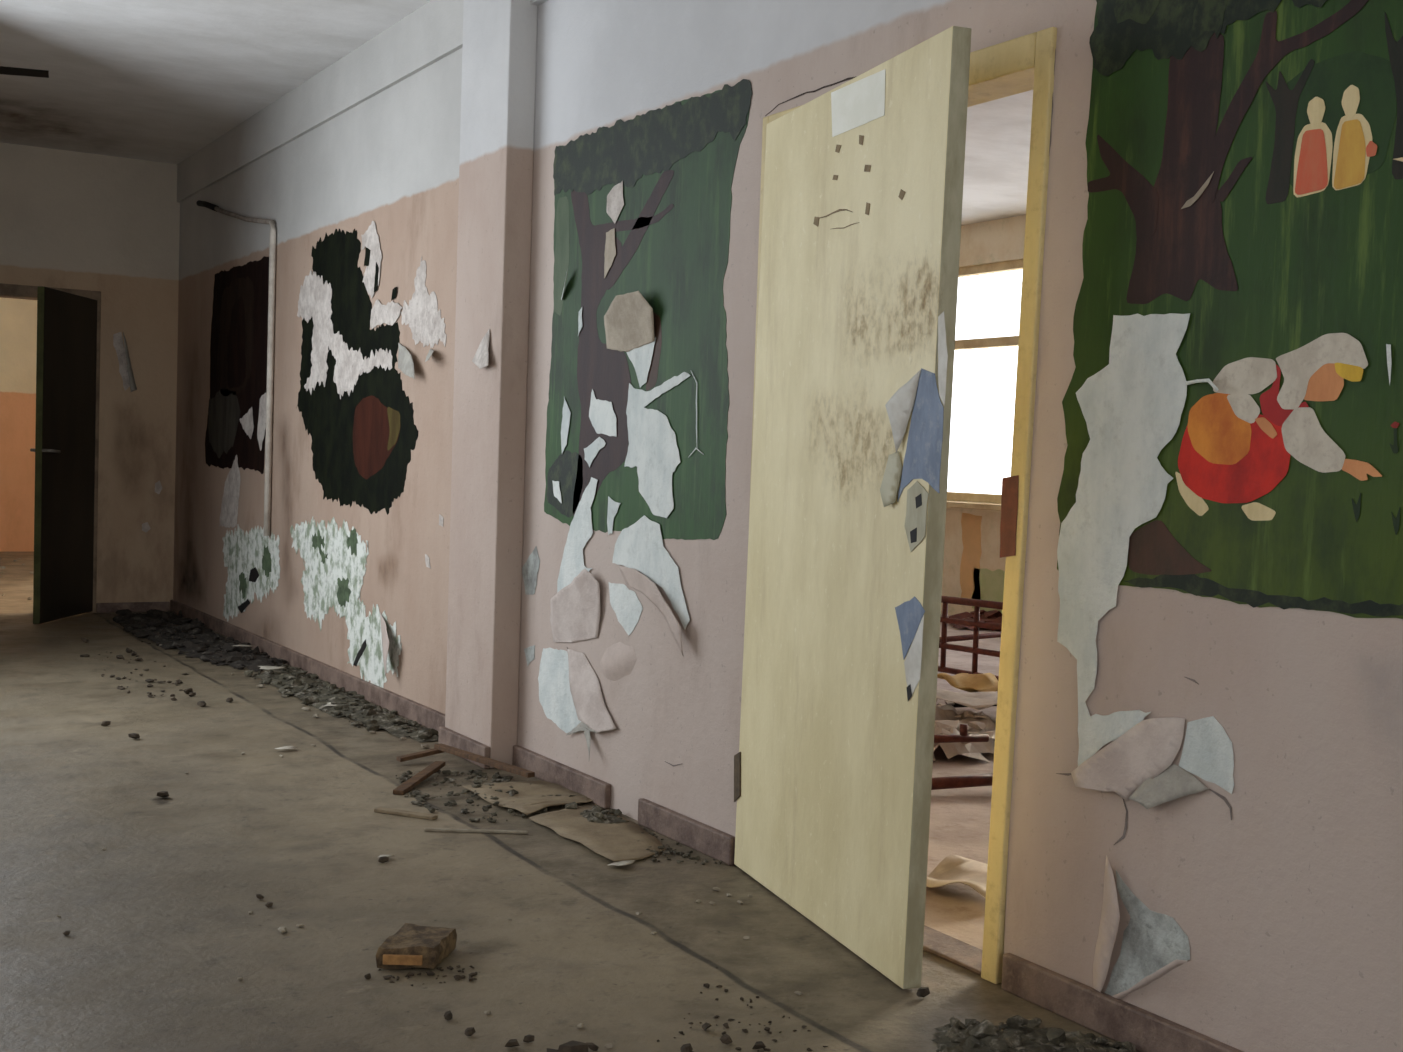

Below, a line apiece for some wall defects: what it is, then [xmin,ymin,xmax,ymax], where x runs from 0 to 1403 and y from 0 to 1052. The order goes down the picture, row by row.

peeling [240,393,266,451]
peeling [219,455,402,688]
peeling [297,221,447,399]
peeling [522,291,704,758]
peeling [1056,313,1234,999]